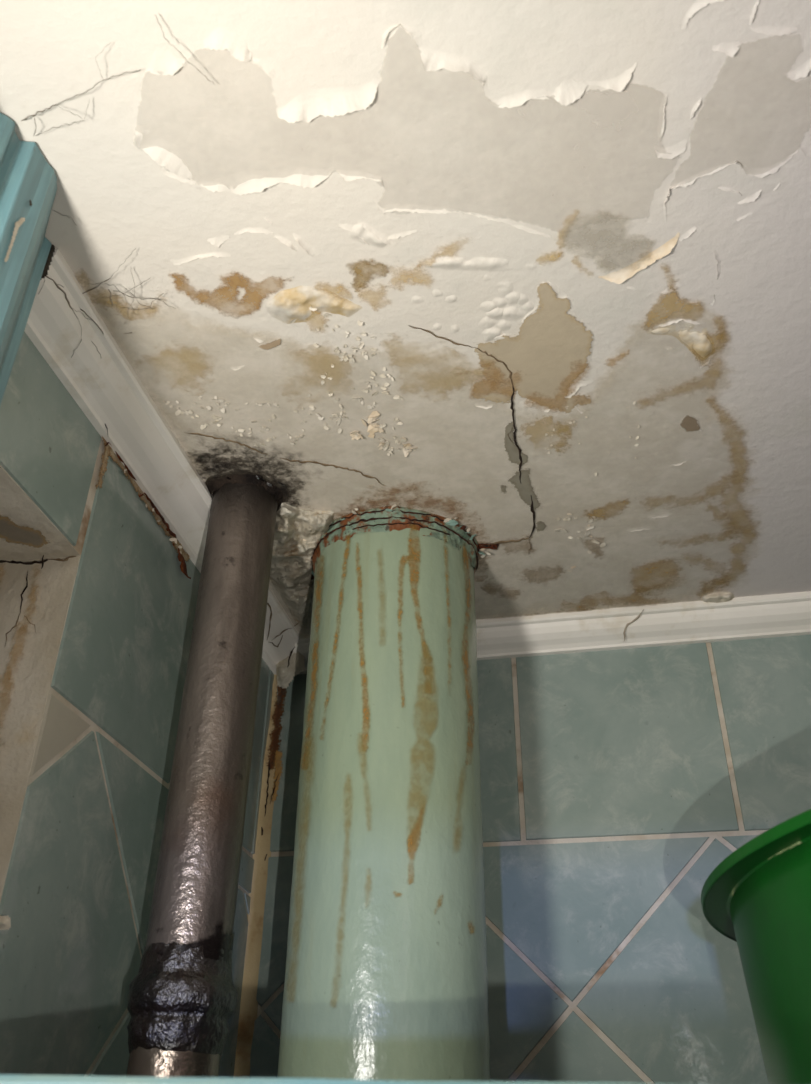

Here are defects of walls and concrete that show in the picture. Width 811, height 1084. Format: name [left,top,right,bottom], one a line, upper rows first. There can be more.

peeling [275,78,381,123]
peeling [493,62,637,108]
water stain [172,273,266,315]
water stain [337,261,386,293]
peeling [470,282,594,424]
water stain [646,286,701,327]
crack [184,326,535,570]
crack [0,555,76,645]
spalling [270,502,358,630]
corrosion [398,524,435,768]
corrosion [448,531,499,764]
corrosion [265,685,287,814]